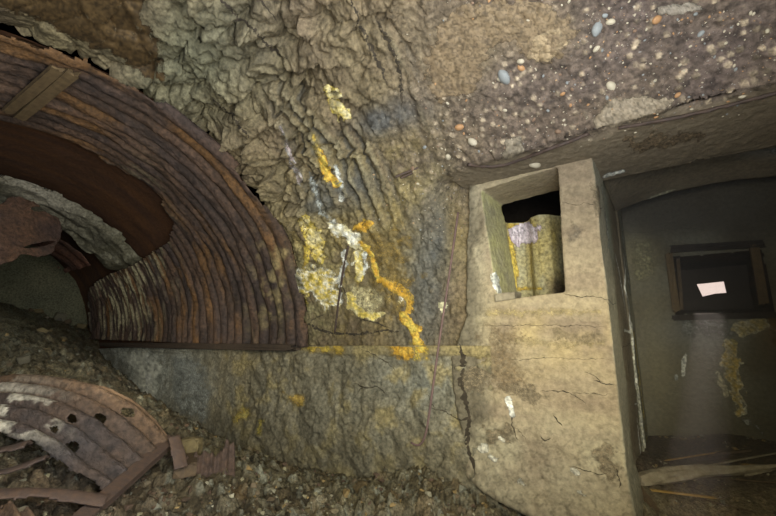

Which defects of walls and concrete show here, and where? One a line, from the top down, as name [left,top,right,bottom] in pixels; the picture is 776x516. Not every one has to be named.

leakage [323,84,352,123]
leakage [280,126,426,359]
leakage [605,217,658,455]
crack [491,357,613,404]
leakage [680,318,771,434]
crack [424,339,475,473]
crack [511,416,562,441]
rust [0,455,49,475]
rust [0,487,109,508]